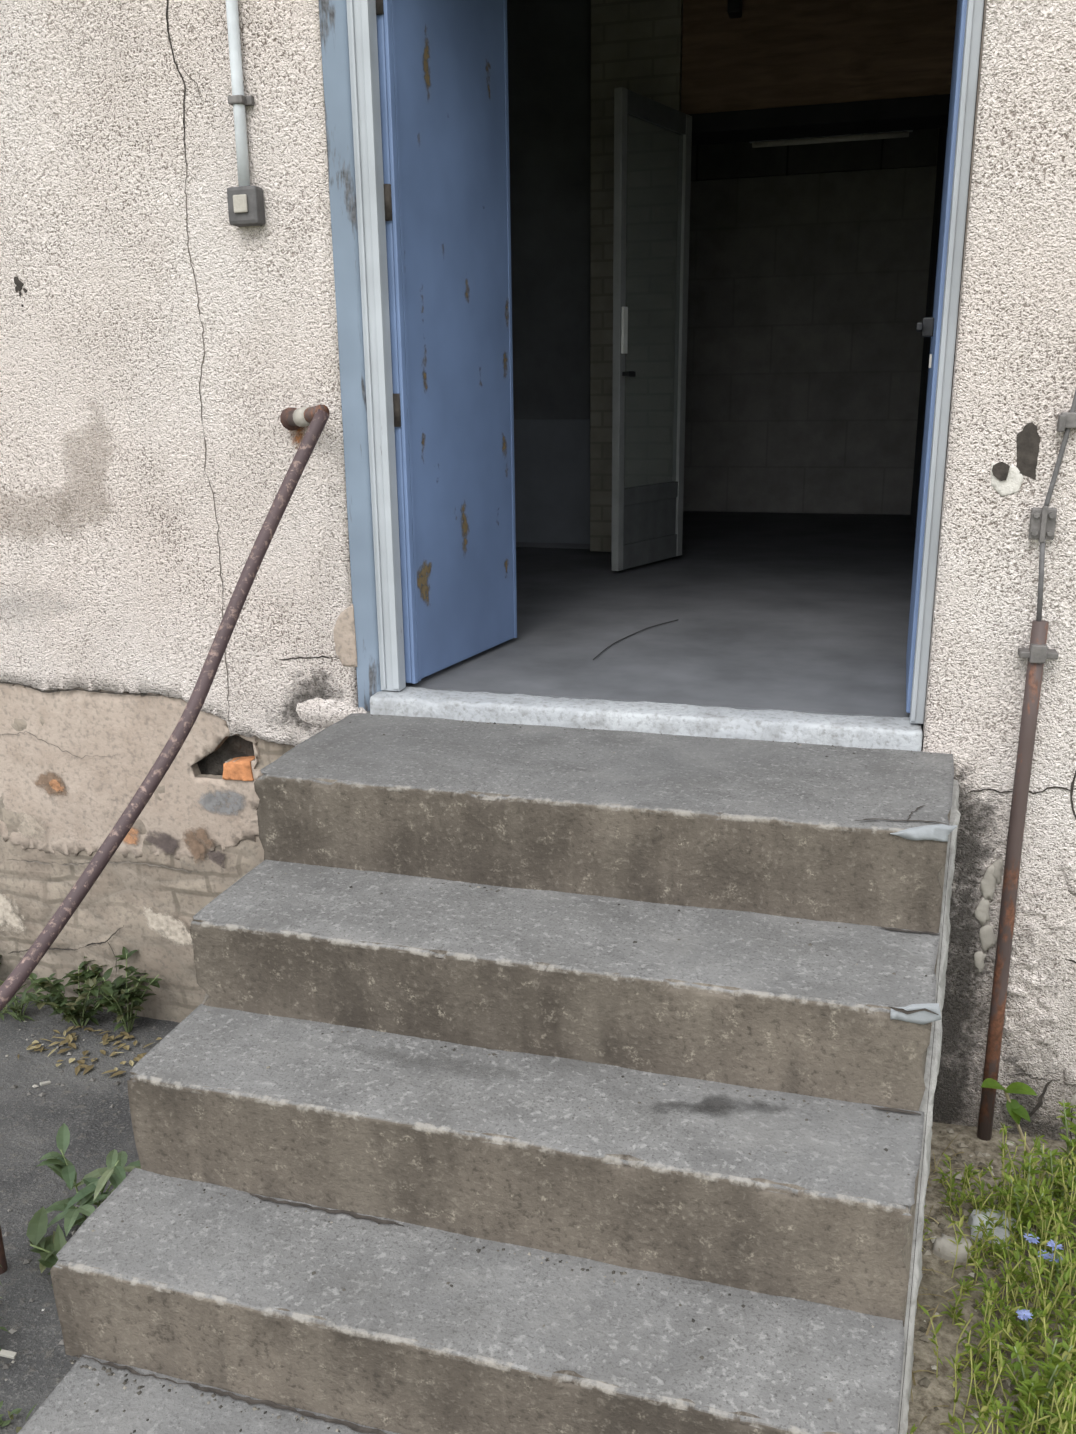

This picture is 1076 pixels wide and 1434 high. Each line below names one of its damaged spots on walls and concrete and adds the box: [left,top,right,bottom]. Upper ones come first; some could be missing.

crack [166,0,230,725]
flaking render [991,462,1023,497]
peeling [0,682,263,868]
damp [933,774,992,1127]
peeling [974,857,1076,1109]